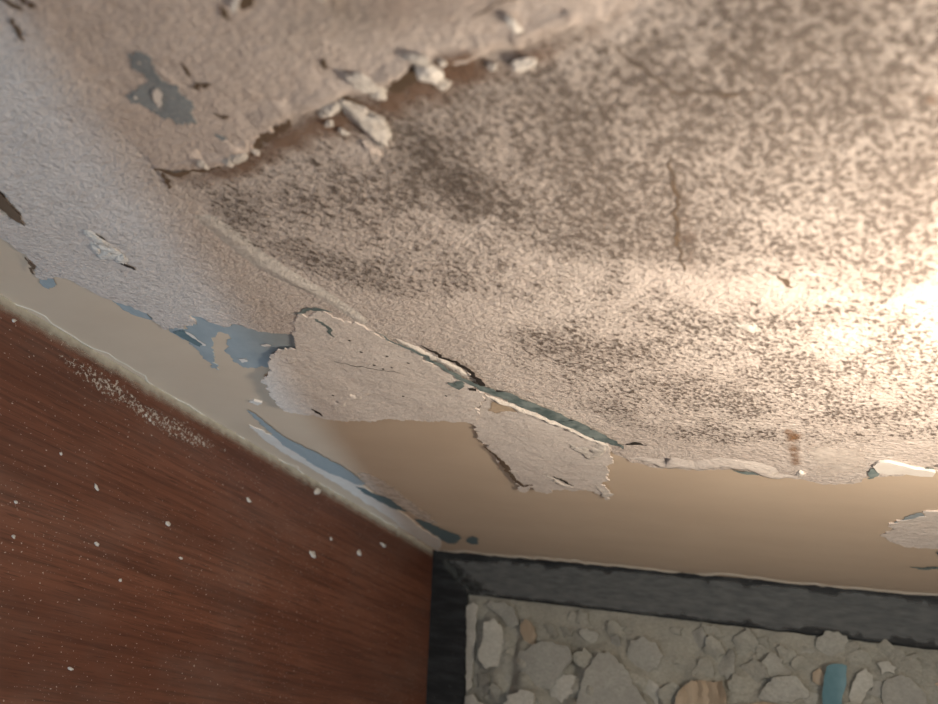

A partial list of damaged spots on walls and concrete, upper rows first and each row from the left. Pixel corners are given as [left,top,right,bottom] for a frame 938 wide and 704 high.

spalling [2,0,36,42]
flaking render [219,0,253,21]
spalling [153,5,620,189]
spalling [82,230,135,270]
leakage [184,0,938,447]
peeling [0,238,938,594]